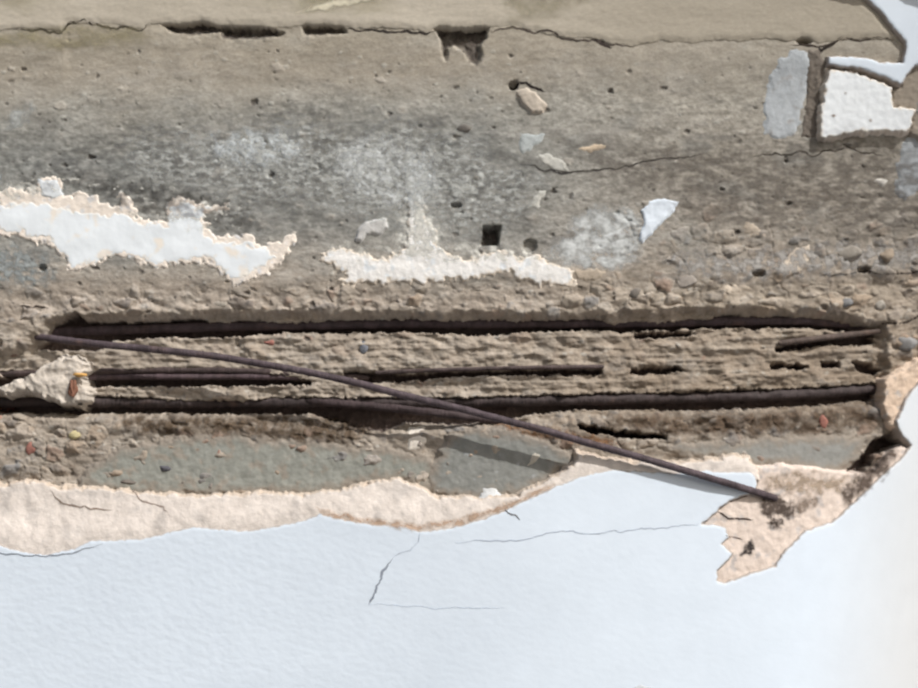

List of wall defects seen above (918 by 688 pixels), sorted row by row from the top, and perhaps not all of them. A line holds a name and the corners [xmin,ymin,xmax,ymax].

crack [14,18,153,34]
crack [346,27,437,35]
hole [439,30,486,64]
crack [491,26,634,48]
flaking render [891,67,918,142]
spalling [519,133,568,171]
damp [131,126,547,261]
rust [68,373,88,398]
rust [123,416,370,443]
spalling [0,238,918,582]
rust [618,408,872,436]
rust [329,487,549,530]